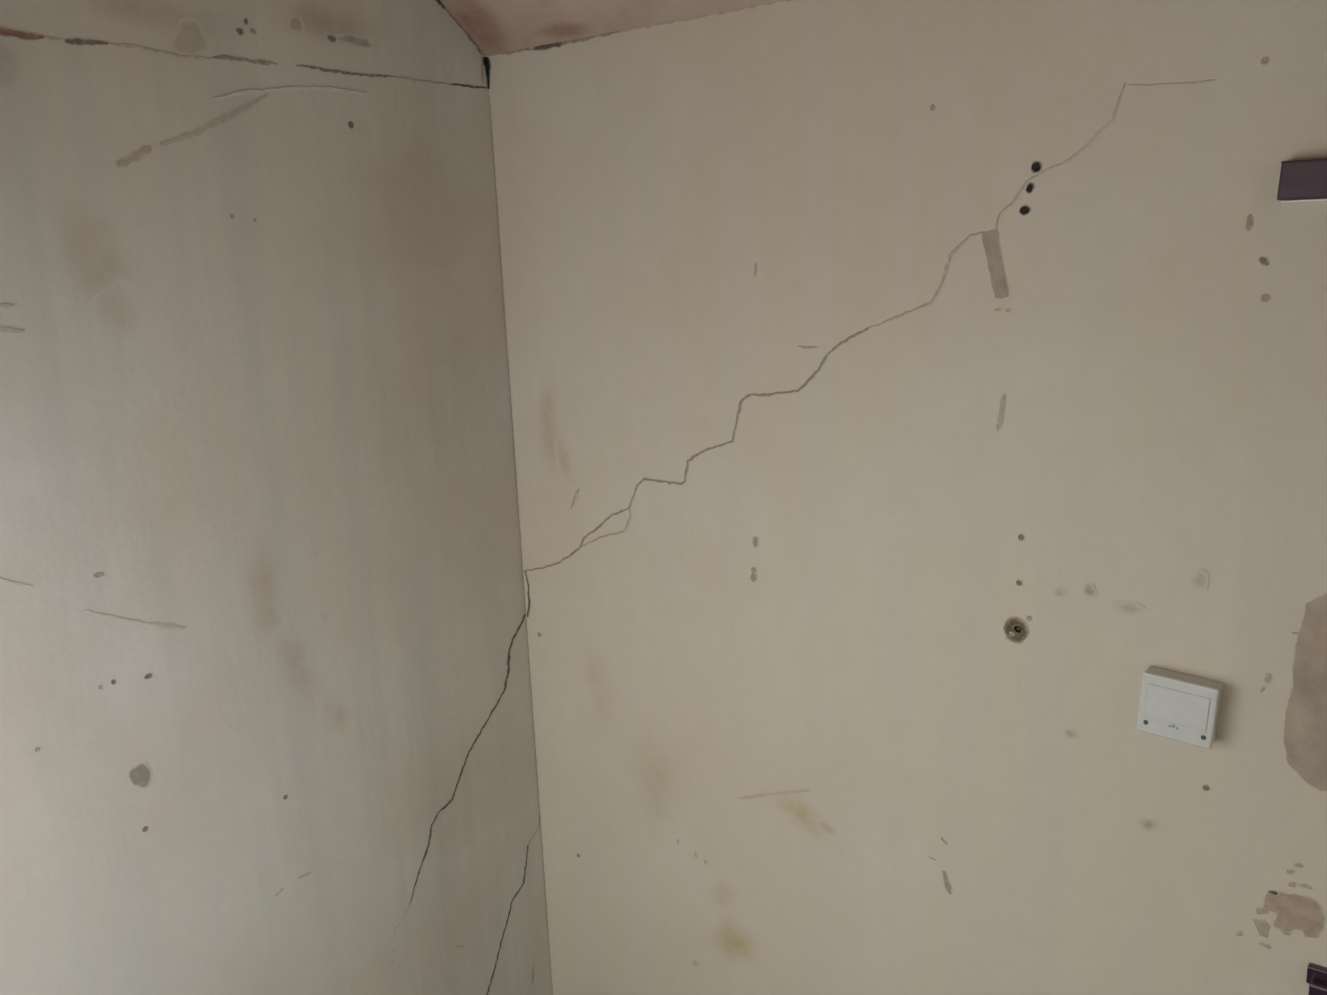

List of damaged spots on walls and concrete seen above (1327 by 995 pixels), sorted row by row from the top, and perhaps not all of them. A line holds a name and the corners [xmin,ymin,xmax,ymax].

crack [0,25,277,66]
crack [433,0,799,56]
crack [297,65,1216,995]
peeling [1282,593,1327,792]
peeling [1235,863,1326,950]